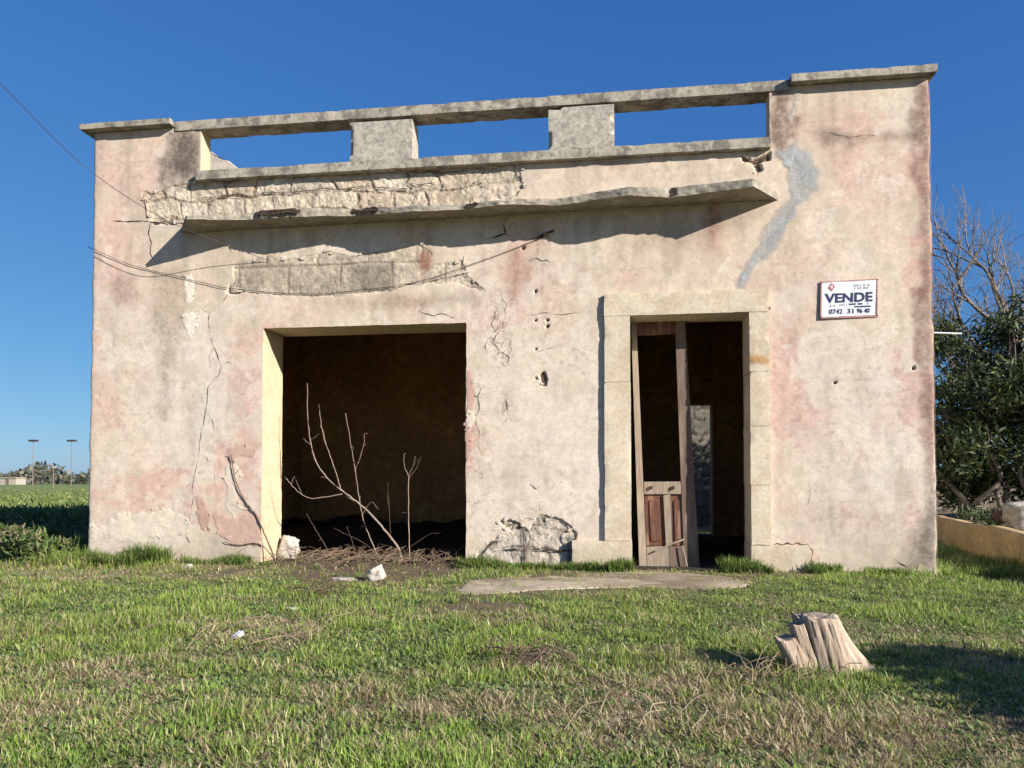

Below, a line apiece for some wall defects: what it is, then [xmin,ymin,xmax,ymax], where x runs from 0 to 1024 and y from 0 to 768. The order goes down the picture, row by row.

crack [117,171,502,259]
spalling [142,152,527,225]
spalling [231,240,485,298]
crack [486,218,552,266]
crack [390,258,580,367]
peeling [89,444,263,547]
spalling [477,515,577,565]